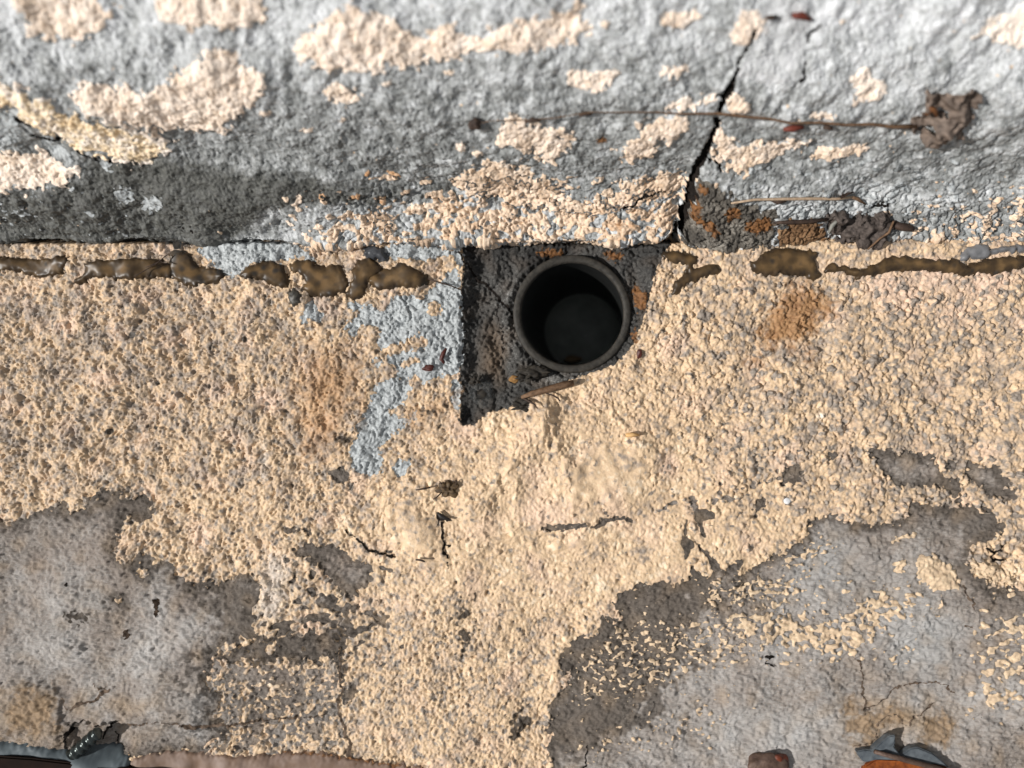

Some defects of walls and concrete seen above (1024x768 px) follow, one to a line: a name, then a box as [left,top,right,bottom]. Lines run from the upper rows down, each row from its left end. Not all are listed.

peeling [0,106,21,149]
peeling [42,135,74,166]
crack [623,29,757,237]
peeling [80,185,163,242]
peeling [749,156,960,238]
crack [872,200,892,208]
rust [758,287,832,340]
spalling [327,239,671,485]
crack [345,529,395,559]
crack [436,512,452,569]
peeling [0,487,401,757]
peeling [541,447,1024,768]